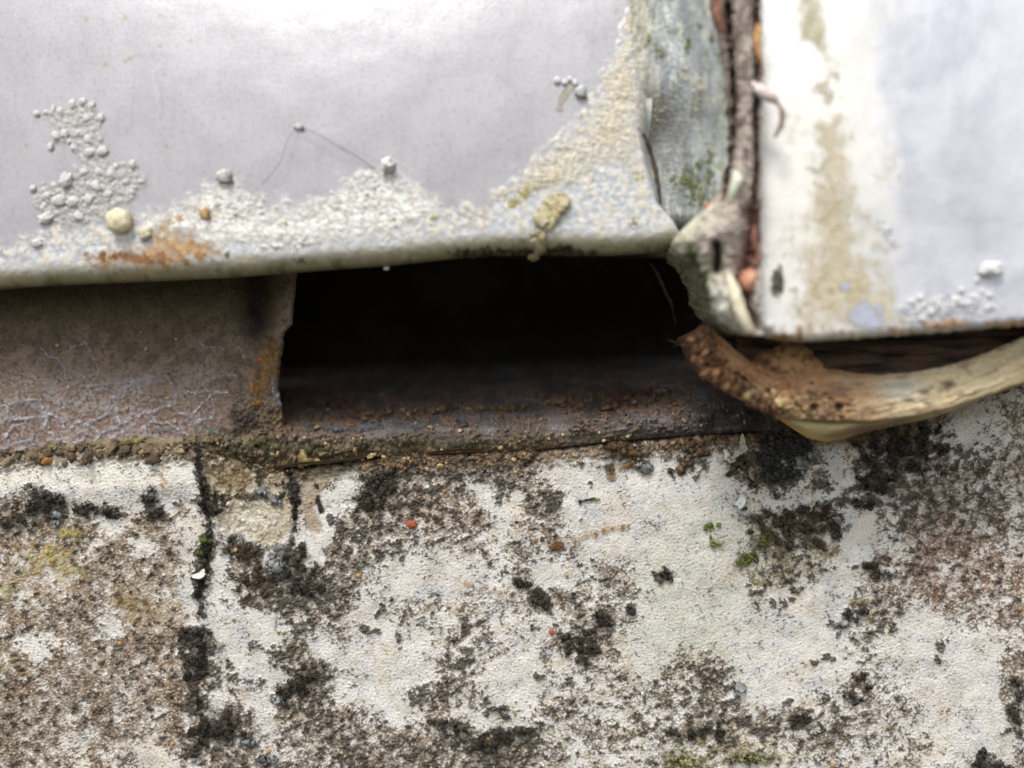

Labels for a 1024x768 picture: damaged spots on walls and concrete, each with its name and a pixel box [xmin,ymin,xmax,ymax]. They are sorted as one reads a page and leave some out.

leakage [141,168,449,253]
corrosion [97,215,211,269]
leakage [598,441,648,481]
leakage [668,434,723,479]
leakage [757,430,812,483]
crack [0,346,228,763]